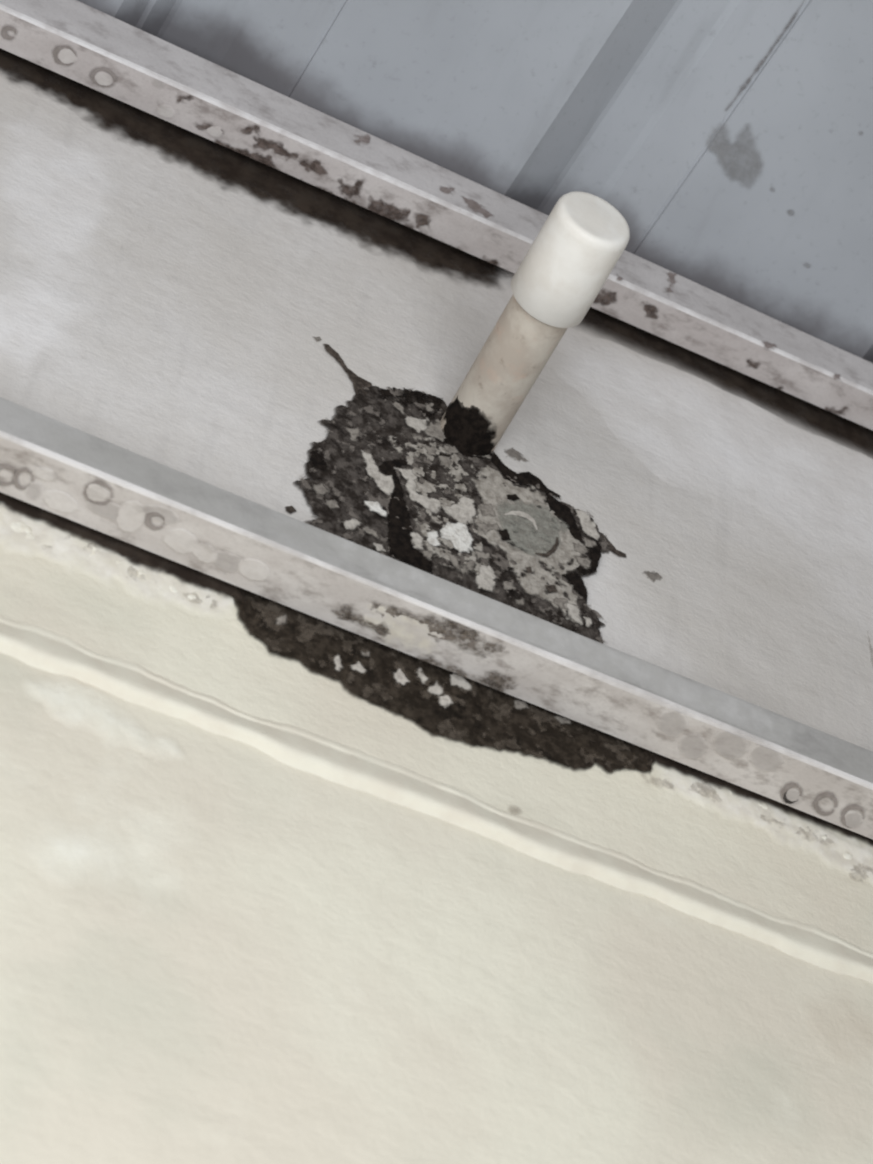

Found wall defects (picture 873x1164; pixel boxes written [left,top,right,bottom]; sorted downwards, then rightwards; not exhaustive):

damp [0,26,502,379]
spalling [285,337,626,644]